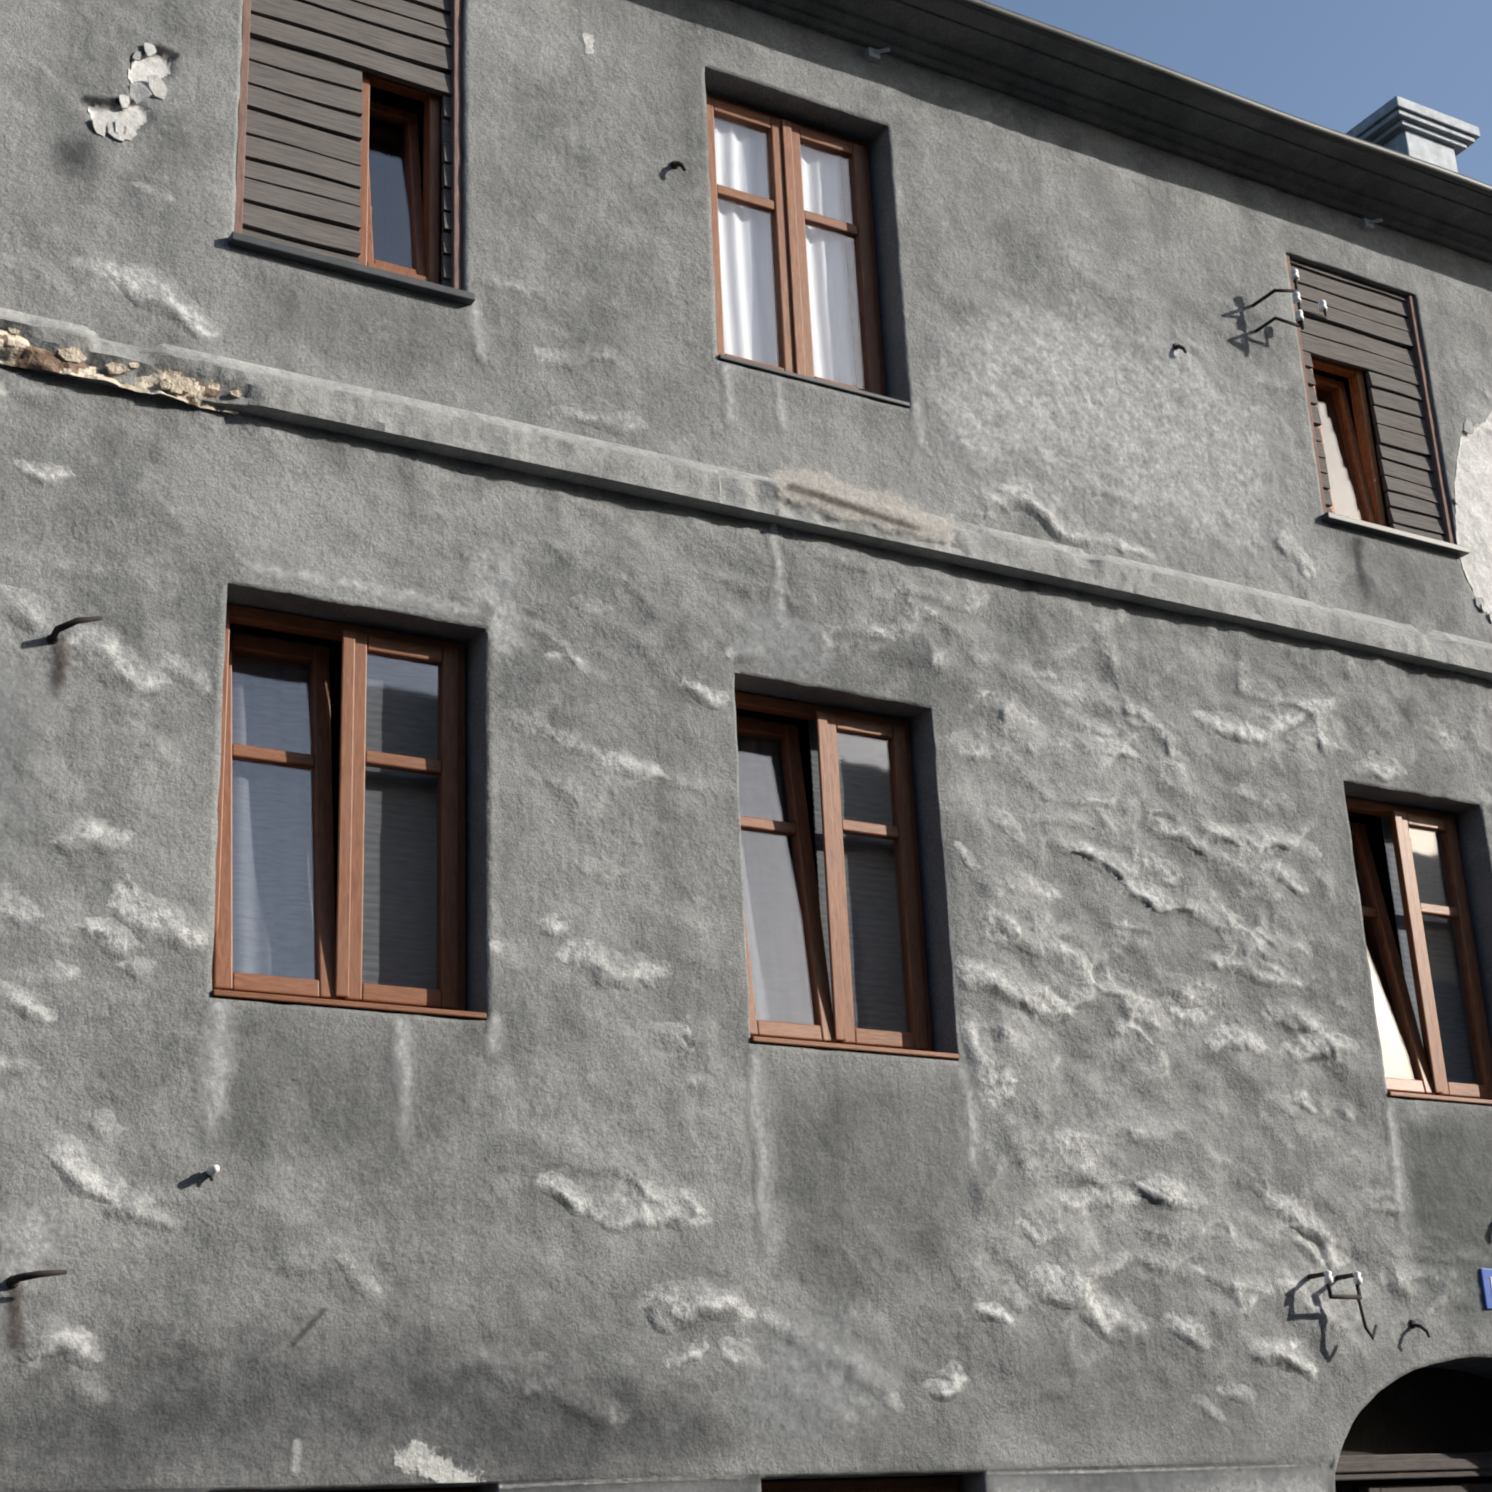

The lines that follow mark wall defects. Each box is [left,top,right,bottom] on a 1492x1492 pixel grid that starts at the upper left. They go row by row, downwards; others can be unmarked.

flaking render [88,43,172,142]
flaking render [0,327,242,415]
flaking render [1454,411,1492,624]